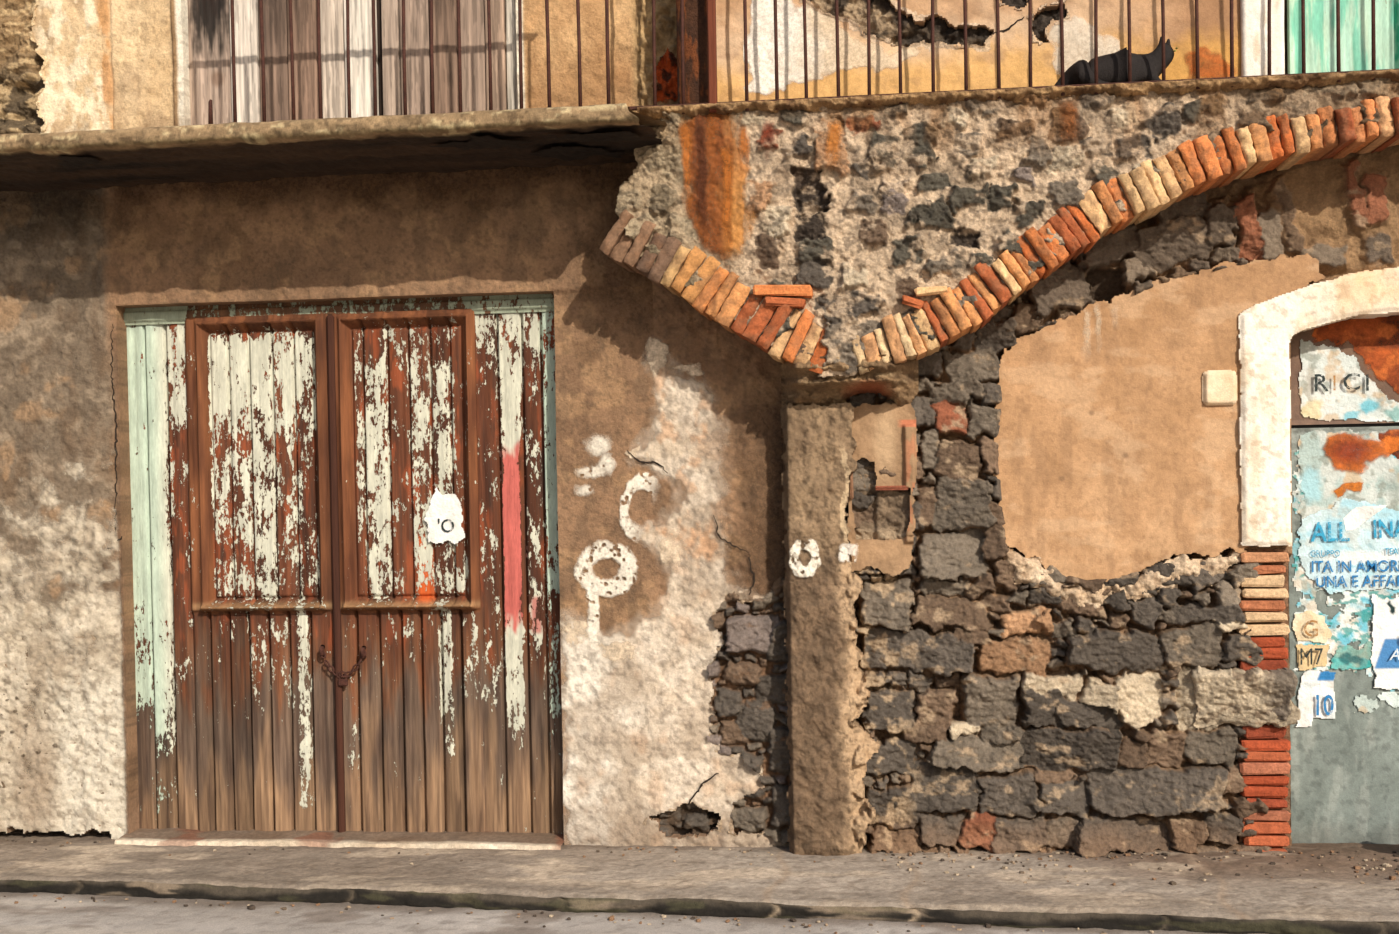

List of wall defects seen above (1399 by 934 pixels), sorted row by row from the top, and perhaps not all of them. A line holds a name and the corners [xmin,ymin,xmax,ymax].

flaking render [0,0,48,135]
peeling [743,0,993,95]
peeling [1000,0,1120,72]
rust [679,113,773,256]
rust [1312,315,1399,394]
rust [1323,429,1399,497]
peeling [560,338,791,847]
crack [713,515,755,595]
flaking render [1003,547,1241,609]